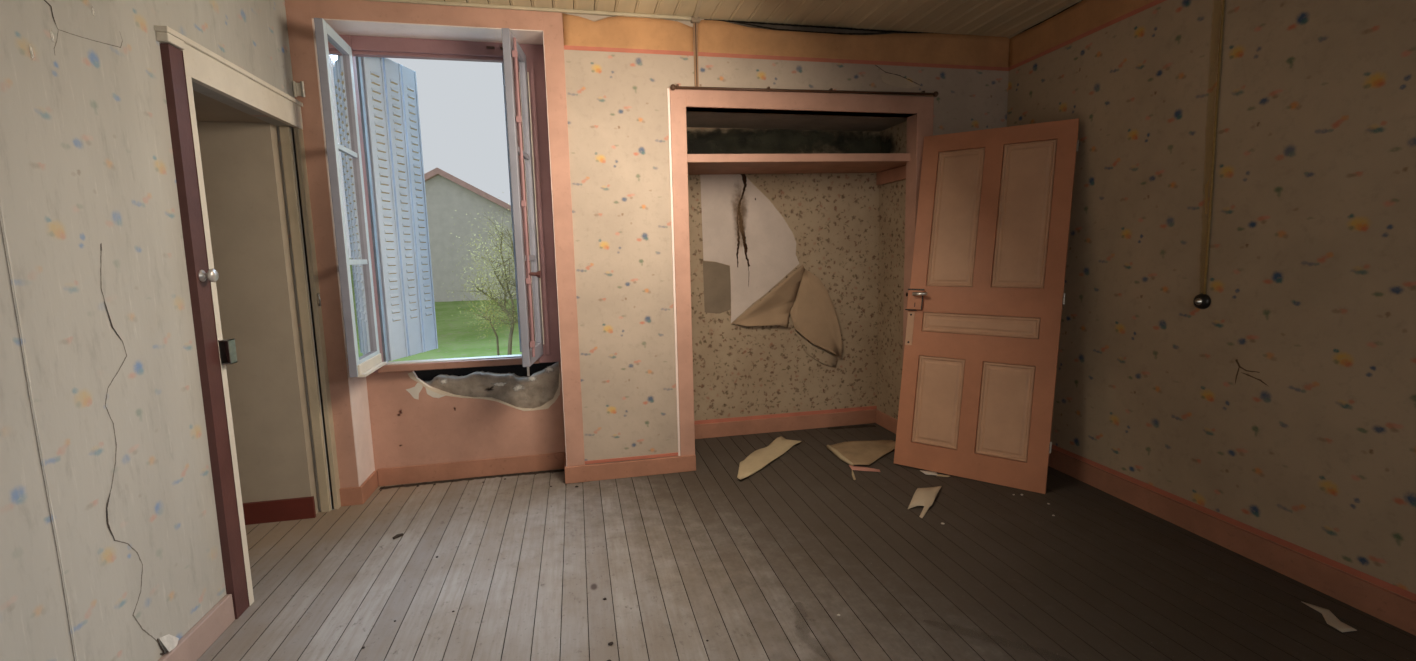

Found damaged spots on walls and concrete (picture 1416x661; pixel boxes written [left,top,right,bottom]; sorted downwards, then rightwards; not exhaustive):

crack [44,0,123,53]
peeling [700,174,799,323]
crack [100,243,162,647]
spalling [406,362,561,411]